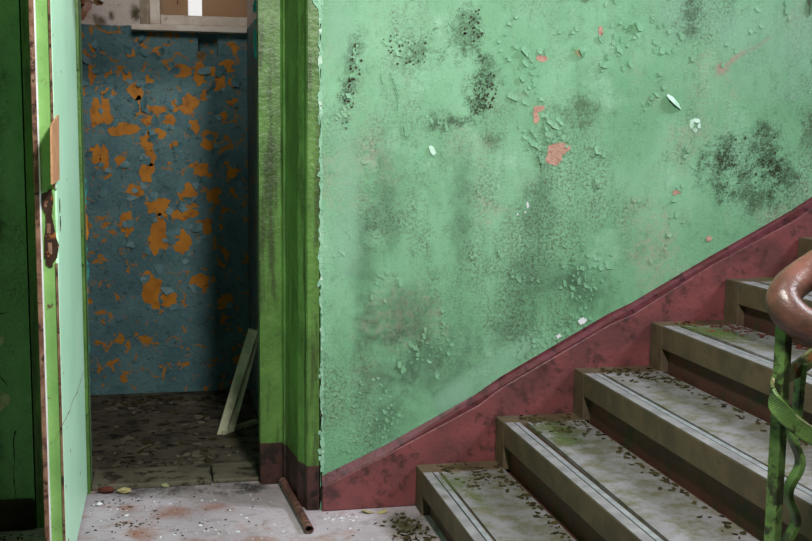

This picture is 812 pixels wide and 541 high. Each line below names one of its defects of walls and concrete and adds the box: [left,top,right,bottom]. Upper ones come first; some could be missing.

spalling [81,0,104,20]
peeling [123,33,170,60]
peeling [382,25,427,65]
peeling [458,8,484,42]
peeling [335,43,363,141]
peeling [474,13,573,168]
peeling [82,40,245,311]
peeling [513,237,623,360]
peeling [392,308,454,374]